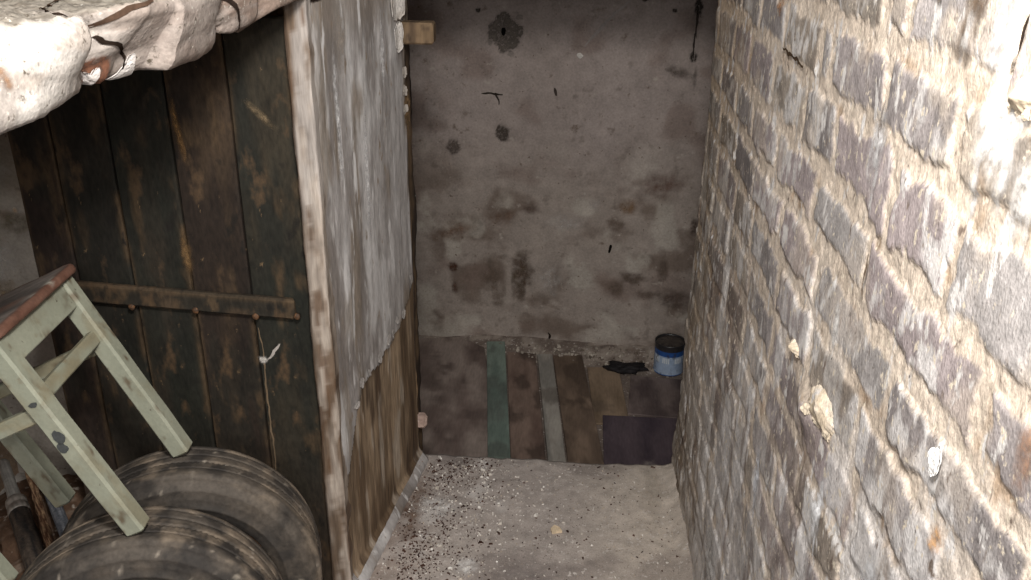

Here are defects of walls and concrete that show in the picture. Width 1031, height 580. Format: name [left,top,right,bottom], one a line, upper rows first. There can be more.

crack [39,0,154,70]